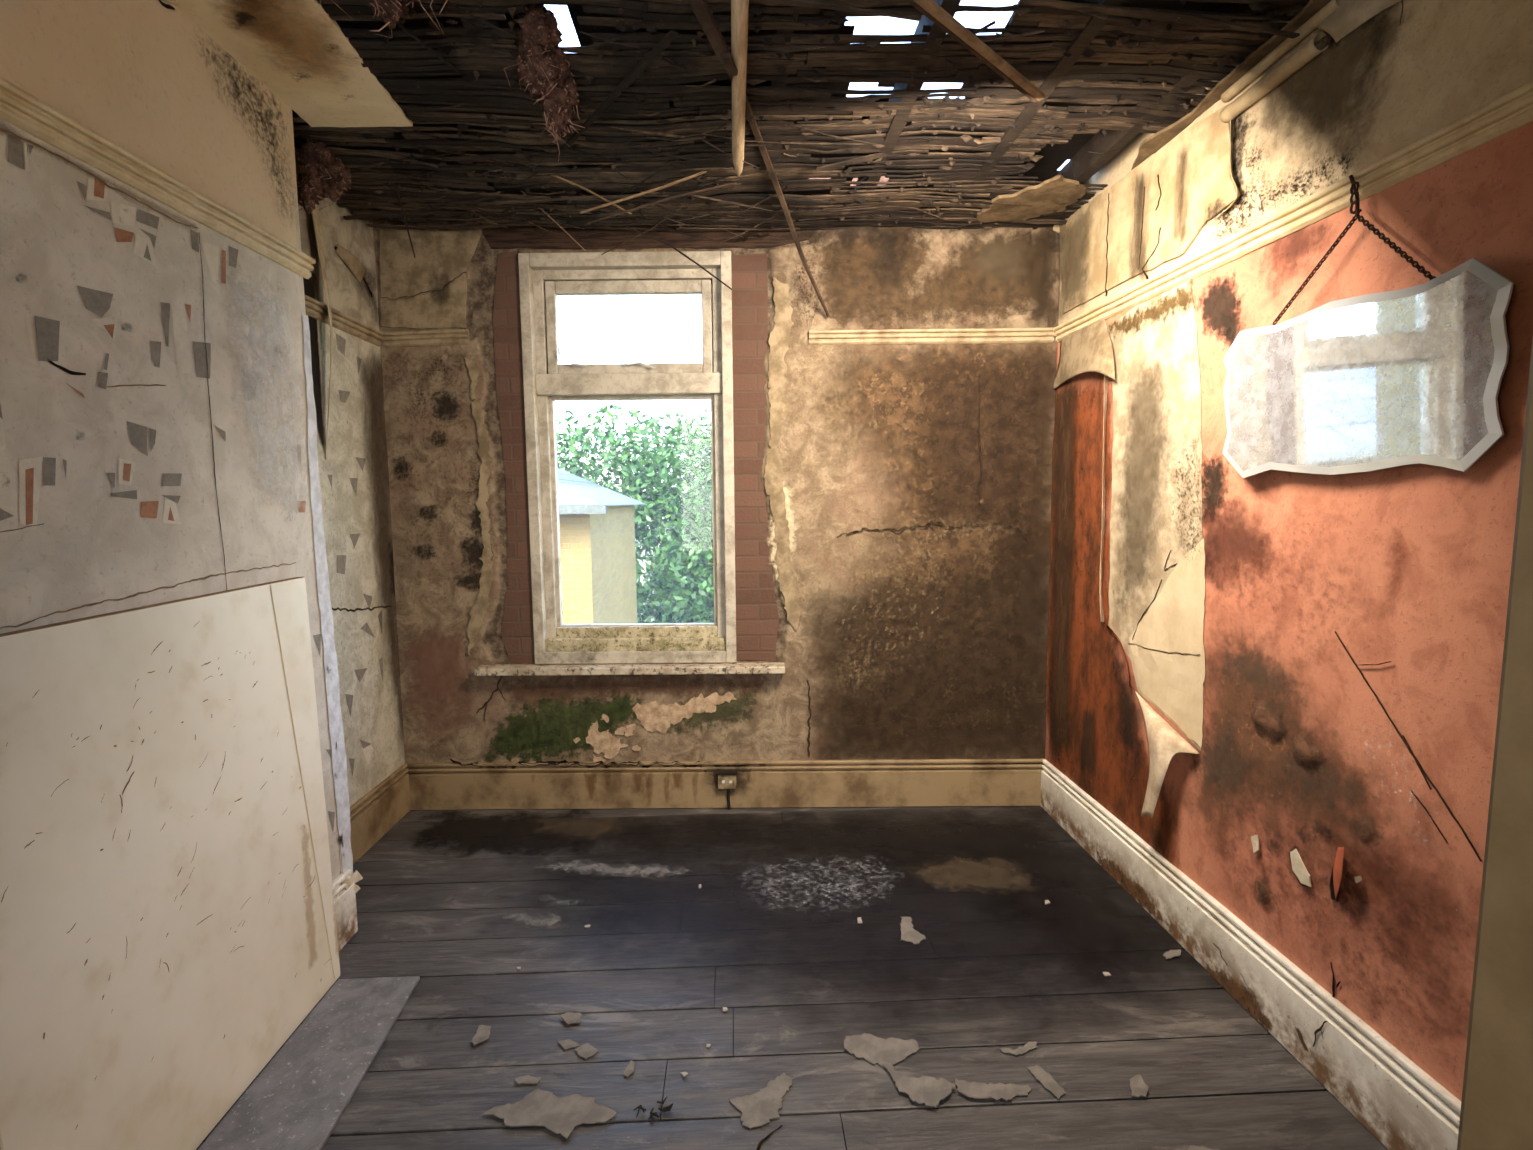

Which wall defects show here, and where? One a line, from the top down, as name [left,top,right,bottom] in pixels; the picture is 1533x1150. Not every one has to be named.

crack [158,0,180,10]
leakage [231,0,334,78]
leakage [1266,15,1386,133]
mould [1217,147,1353,236]
leakage [1109,277,1241,345]
crack [837,373,1028,542]
mould [457,508,484,589]
leakage [768,482,815,579]
leakage [795,206,1177,865]
leakage [1176,450,1266,577]
flaking render [573,691,737,762]
leakage [1199,654,1448,974]